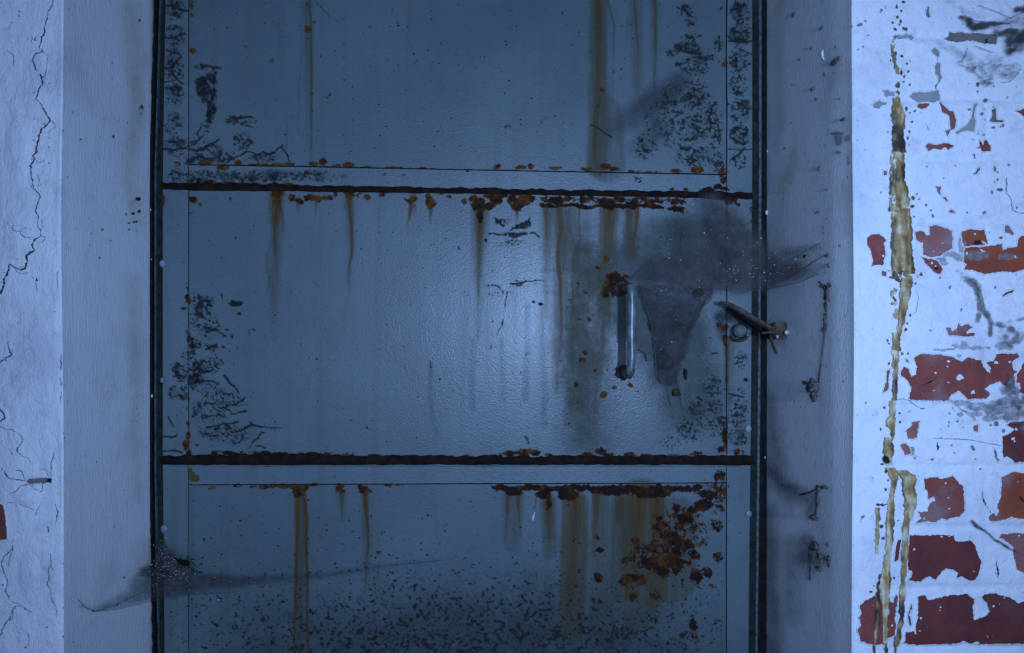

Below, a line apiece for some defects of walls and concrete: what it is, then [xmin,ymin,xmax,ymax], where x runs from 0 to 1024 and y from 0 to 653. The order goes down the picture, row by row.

crack [0,0,65,294]
rust [181,158,386,267]
rust [404,168,754,301]
rust [581,163,704,183]
leakage [636,1,753,171]
peeling [913,210,1024,276]
leakage [169,294,278,449]
leakage [870,1,923,653]
peeling [881,351,1024,403]
rust [491,470,729,604]
peeling [856,474,1024,647]
peeling [987,419,1024,574]